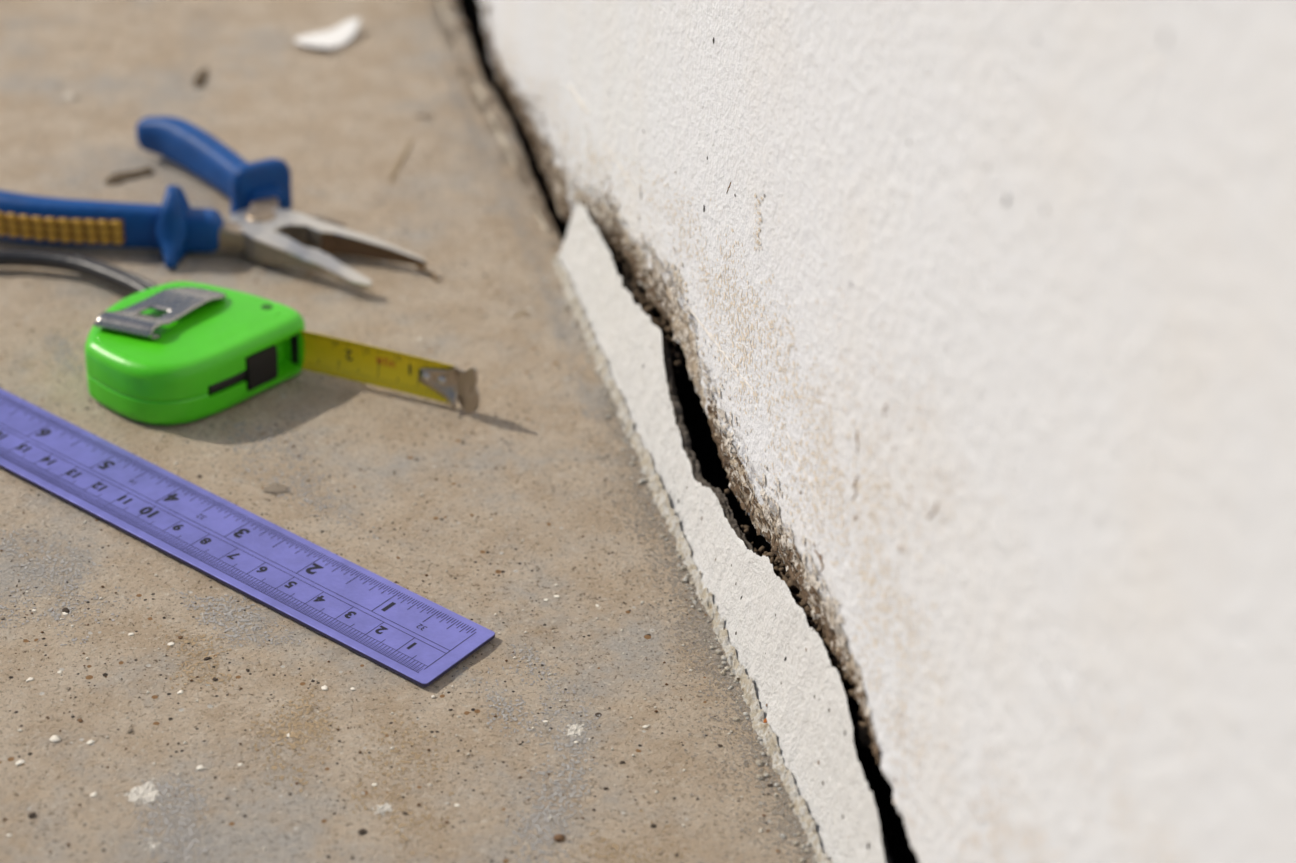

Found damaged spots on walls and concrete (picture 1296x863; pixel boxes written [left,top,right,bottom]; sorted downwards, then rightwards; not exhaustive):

crack [458,0,569,242]
flaking render [491,23,879,754]
crack [605,181,919,863]
spalling [880,826,892,863]